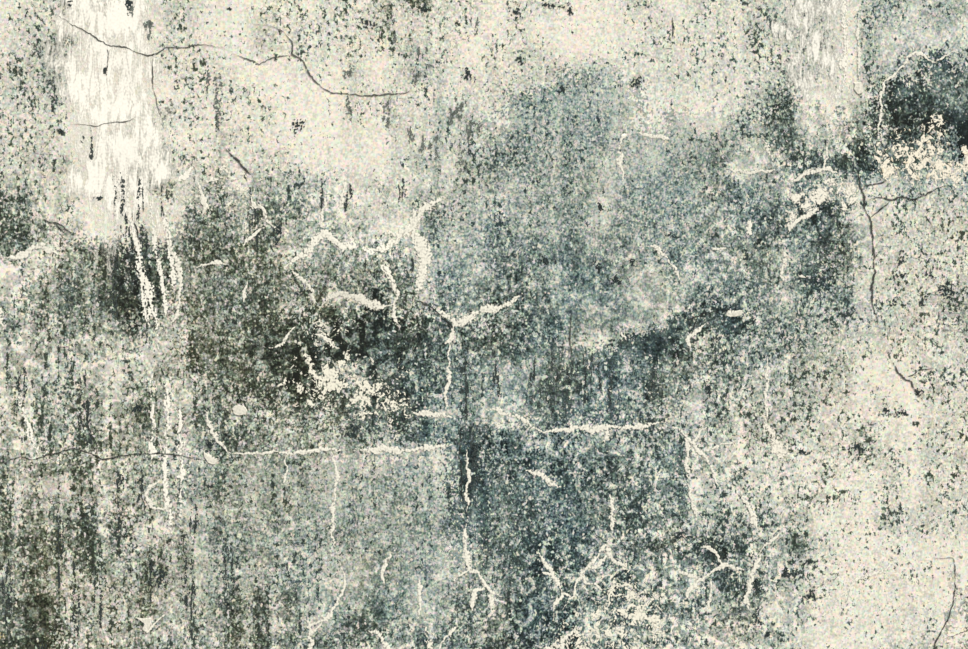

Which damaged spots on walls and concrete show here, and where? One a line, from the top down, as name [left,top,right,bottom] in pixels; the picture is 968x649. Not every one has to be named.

crack [59,16,425,122]
leakage [0,190,63,265]
leakage [107,163,228,353]
crack [858,158,949,331]
leakage [144,45,968,649]
leakage [14,358,39,458]
leakage [77,370,94,448]
leakage [0,471,144,649]
crack [933,557,968,649]